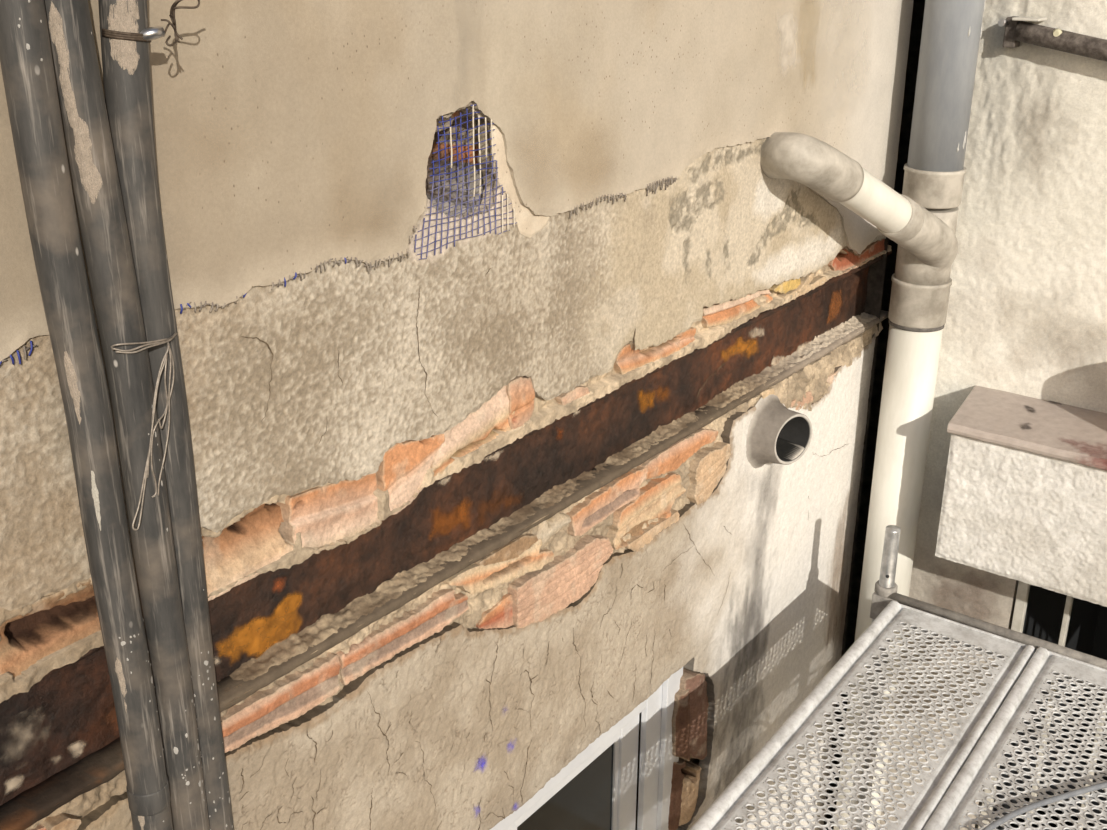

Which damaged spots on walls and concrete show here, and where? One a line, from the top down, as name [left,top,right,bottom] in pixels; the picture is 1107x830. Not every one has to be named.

spalling [425,110,550,238]
crack [416,289,437,416]
corrosion [722,338,756,359]
corrosion [828,293,841,321]
corrosion [435,502,469,533]
spalling [201,239,891,753]
spalling [0,577,104,703]
crack [77,792,133,830]
corrosion [219,583,302,659]
crack [225,333,875,830]
spalling [668,667,709,830]
water stain [730,606,766,775]